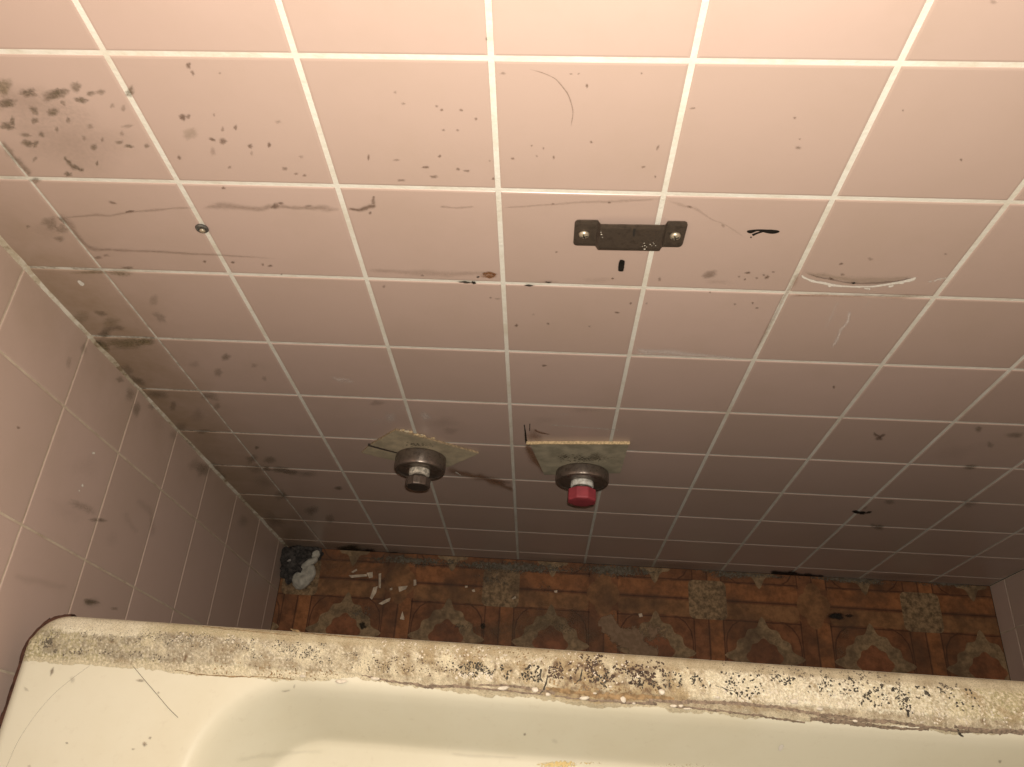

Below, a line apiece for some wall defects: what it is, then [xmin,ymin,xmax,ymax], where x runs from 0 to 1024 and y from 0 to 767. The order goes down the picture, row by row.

leakage [346,612,1024,735]